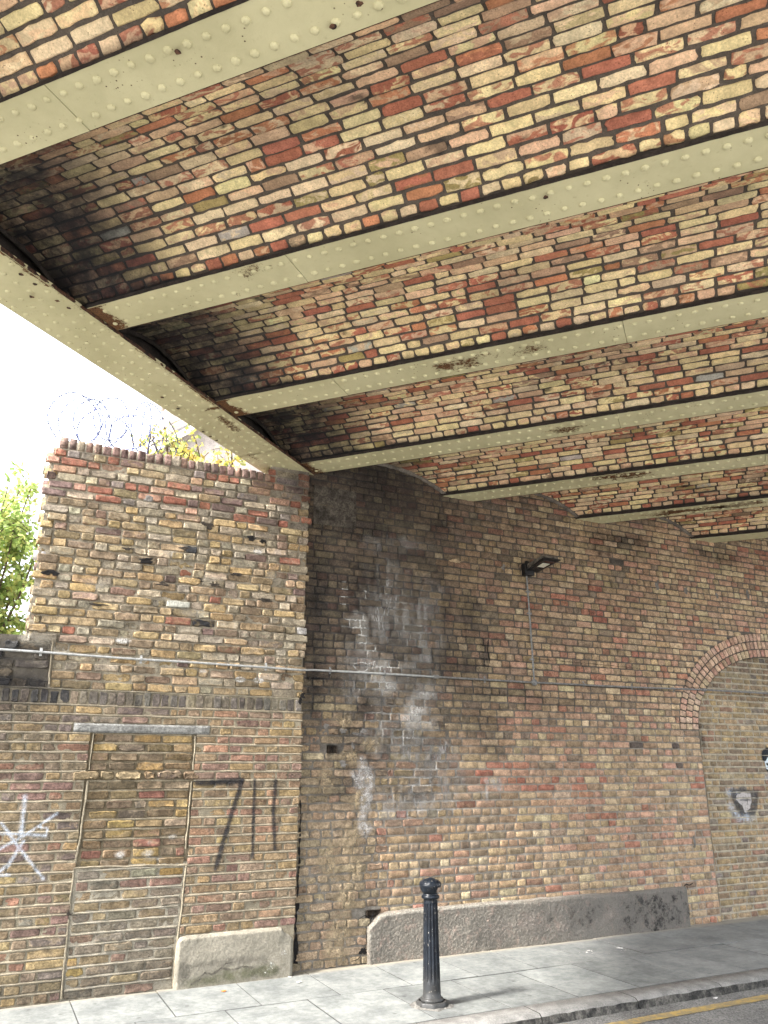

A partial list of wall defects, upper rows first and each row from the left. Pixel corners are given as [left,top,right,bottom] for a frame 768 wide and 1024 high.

corrosion [81,305,127,332]
corrosion [432,353,498,372]
damp [351,757,373,833]